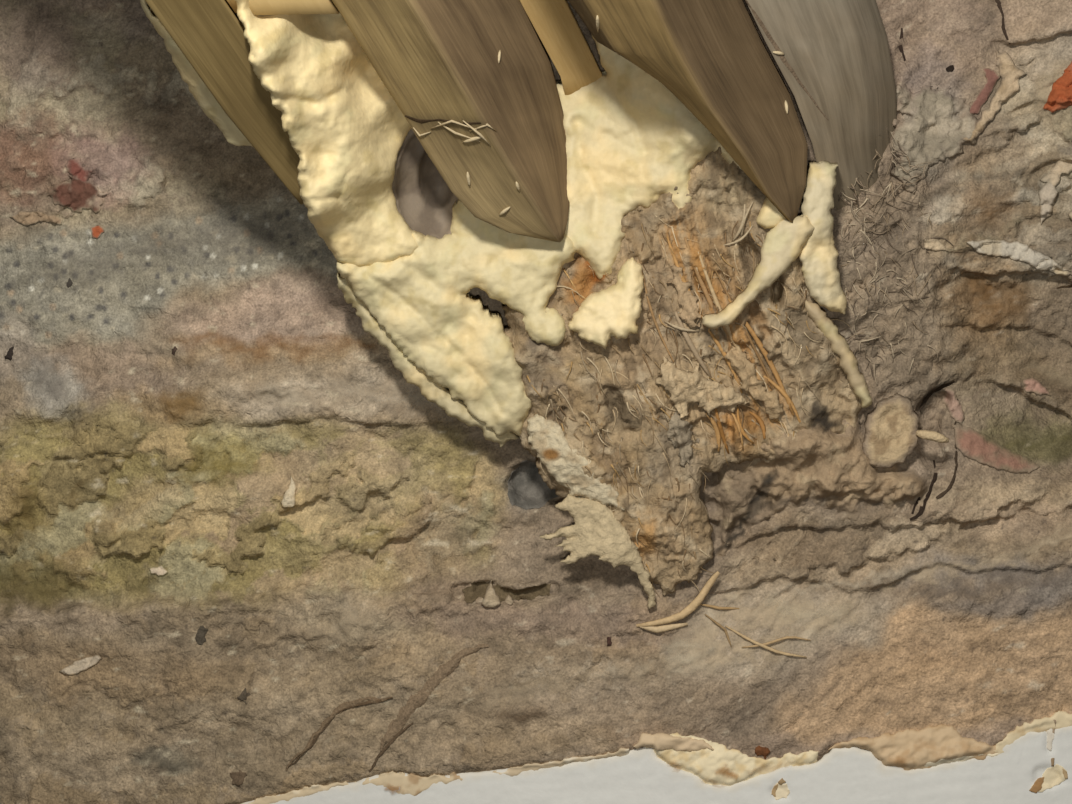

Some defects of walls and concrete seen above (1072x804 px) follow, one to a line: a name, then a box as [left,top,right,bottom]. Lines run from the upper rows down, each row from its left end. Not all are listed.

peeling [248,771,463,804]
peeling [493,711,1072,800]